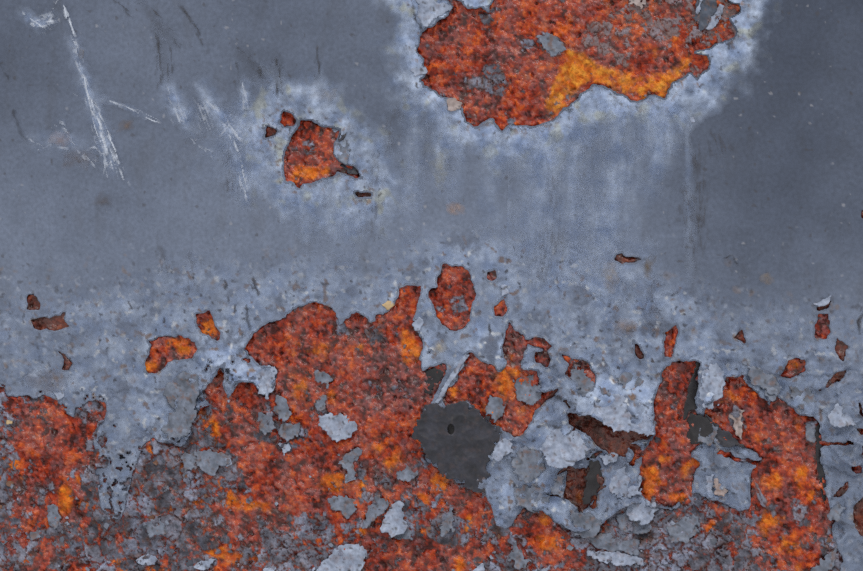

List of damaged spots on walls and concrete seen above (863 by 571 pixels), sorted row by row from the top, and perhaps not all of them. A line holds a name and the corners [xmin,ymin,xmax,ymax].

corrosion [411,0,740,131]
corrosion [265,111,360,188]
peeling [412,317,424,331]
corrosion [814,295,848,361]
corrosion [0,264,553,571]
peeling [485,395,506,423]
peeling [513,375,542,405]
corrosion [562,354,595,384]
peeling [570,361,655,436]
peeling [698,363,726,409]
corrosion [629,325,863,528]
peeling [488,426,846,571]